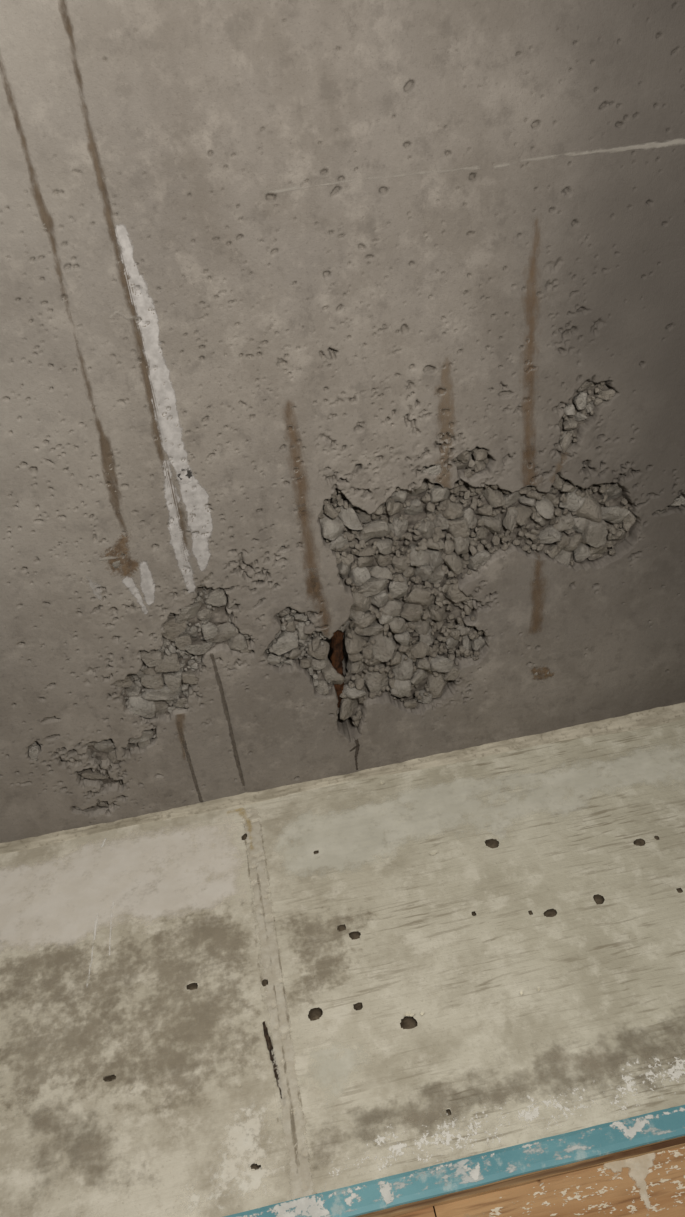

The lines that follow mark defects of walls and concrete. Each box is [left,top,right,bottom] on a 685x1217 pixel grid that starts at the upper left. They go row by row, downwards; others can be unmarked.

efflorescence [115,225,213,593]
corrosion [287,405,327,630]
efflorescence [122,561,155,614]
spalling [330,630,344,715]
efflorescence [178,1105,285,1214]
leakage [329,1057,685,1176]